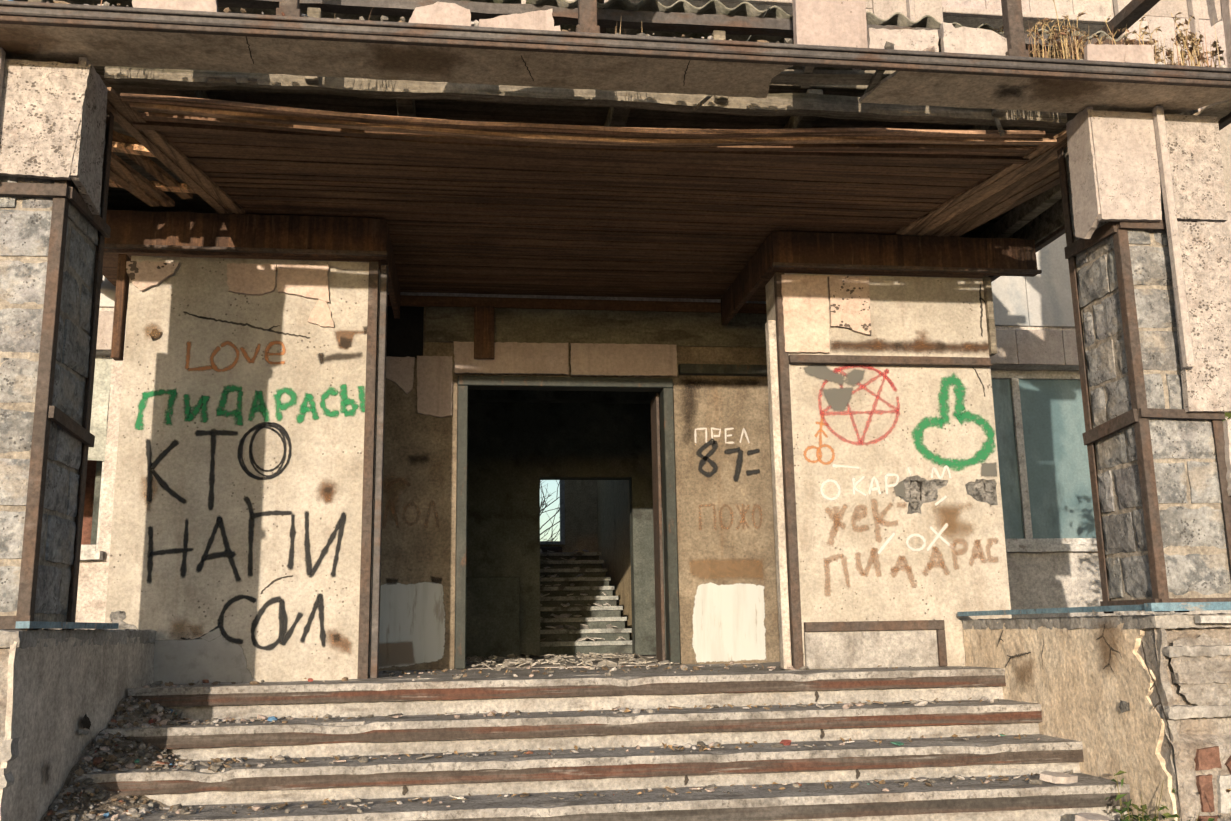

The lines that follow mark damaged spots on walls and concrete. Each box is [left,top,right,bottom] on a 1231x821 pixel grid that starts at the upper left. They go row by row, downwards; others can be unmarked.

spalling [146,326,163,341]
spalling [894,475,948,514]
spalling [965,463,998,505]
crack [997,630,1044,668]